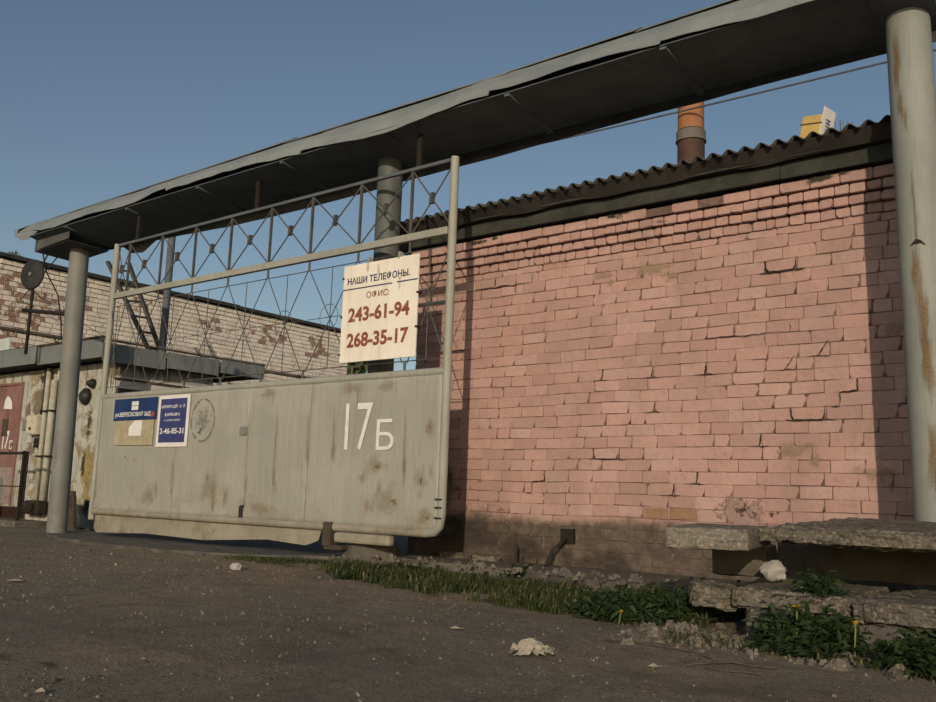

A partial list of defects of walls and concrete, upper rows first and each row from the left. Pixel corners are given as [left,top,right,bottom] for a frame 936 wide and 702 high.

peeling [251,325,287,346]
peeling [305,336,330,358]
corrosion [913,256,933,385]
spalling [713,495,779,526]